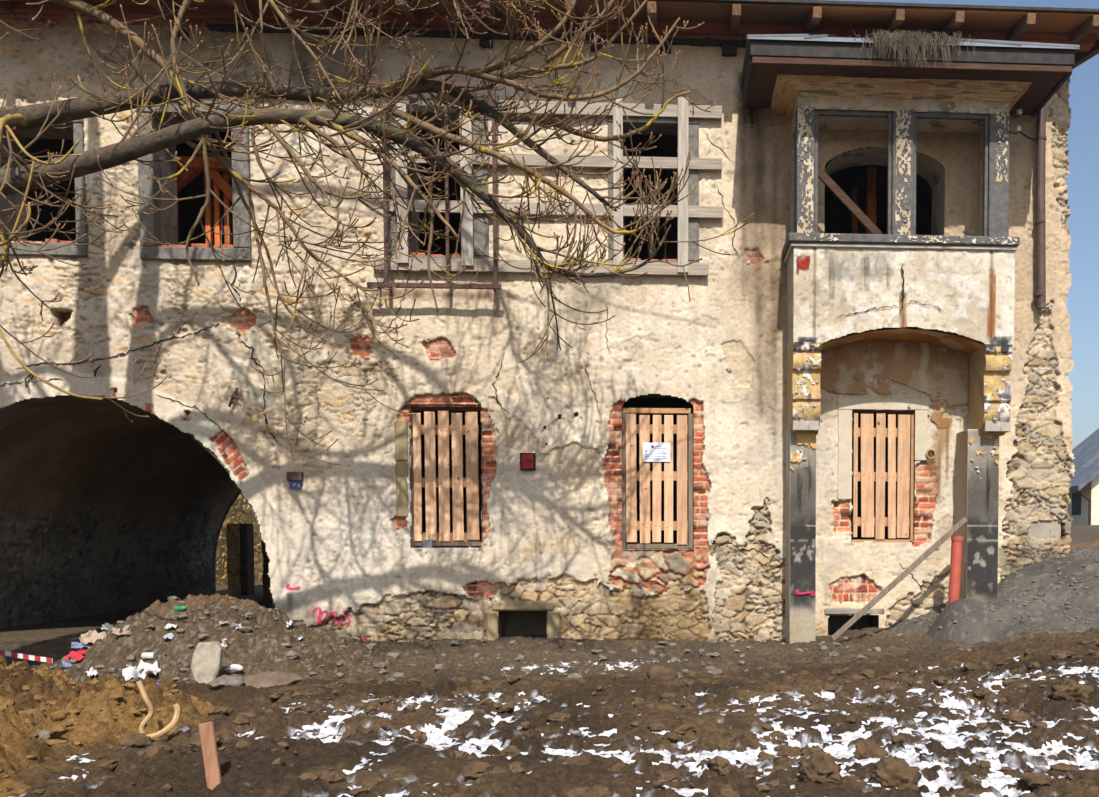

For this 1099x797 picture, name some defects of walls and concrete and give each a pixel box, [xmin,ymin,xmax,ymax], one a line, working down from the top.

peeling [797,95,1009,244]
crack [1,322,283,446]
crack [224,262,244,302]
flaking render [293,336,397,464]
flaking render [423,338,457,361]
peeling [791,341,968,470]
crack [838,262,944,317]
flaking render [968,301,1073,579]
flaking render [311,392,785,642]
flaking render [912,462,939,549]
flaking render [828,574,883,605]
flaking render [885,571,950,628]